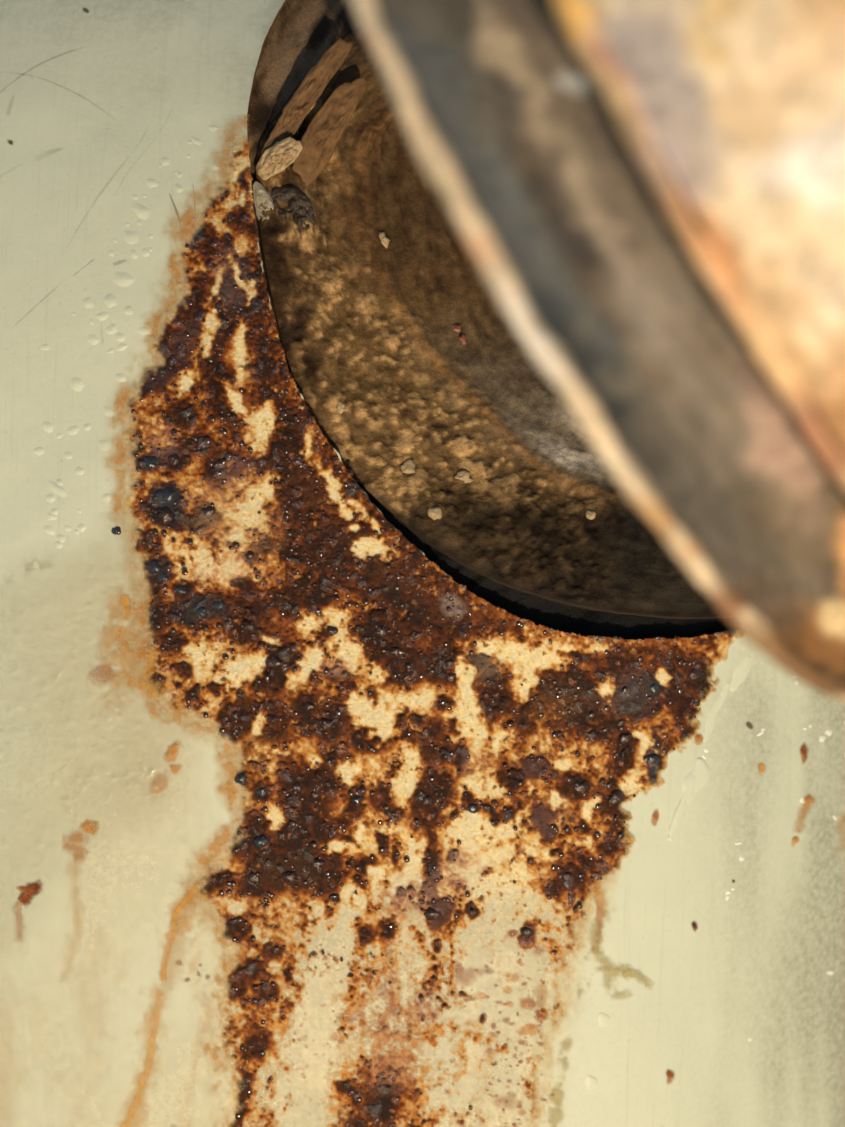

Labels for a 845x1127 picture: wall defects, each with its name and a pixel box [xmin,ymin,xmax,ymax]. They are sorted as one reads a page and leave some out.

rust [90,118,741,1127]
rust [69,822,97,849]
rust [14,883,41,937]